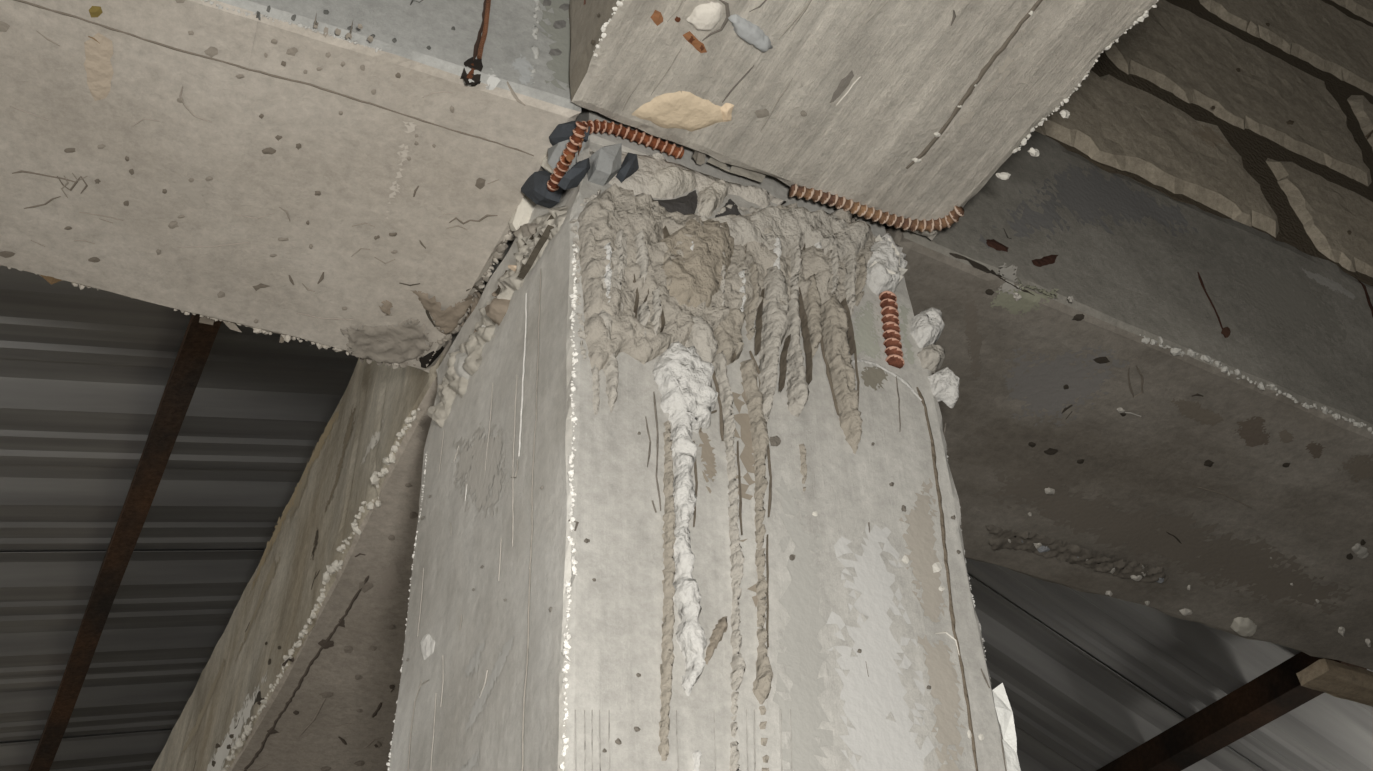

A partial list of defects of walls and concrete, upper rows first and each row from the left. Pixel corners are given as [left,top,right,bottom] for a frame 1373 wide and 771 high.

damp [177,404,357,771]
spalling [174,90,964,771]
damp [1171,398,1326,459]
damp [1351,543,1369,559]